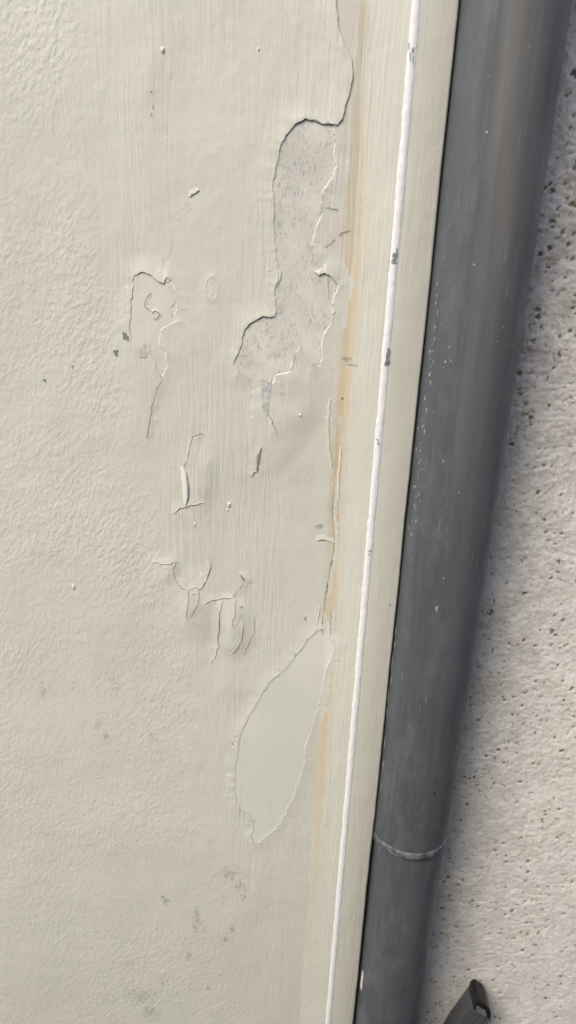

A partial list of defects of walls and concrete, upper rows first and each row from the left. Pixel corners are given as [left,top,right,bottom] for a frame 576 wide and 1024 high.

peeling [112,252,194,393]
peeling [212,0,356,433]
peeling [171,433,204,513]
peeling [221,615,349,854]